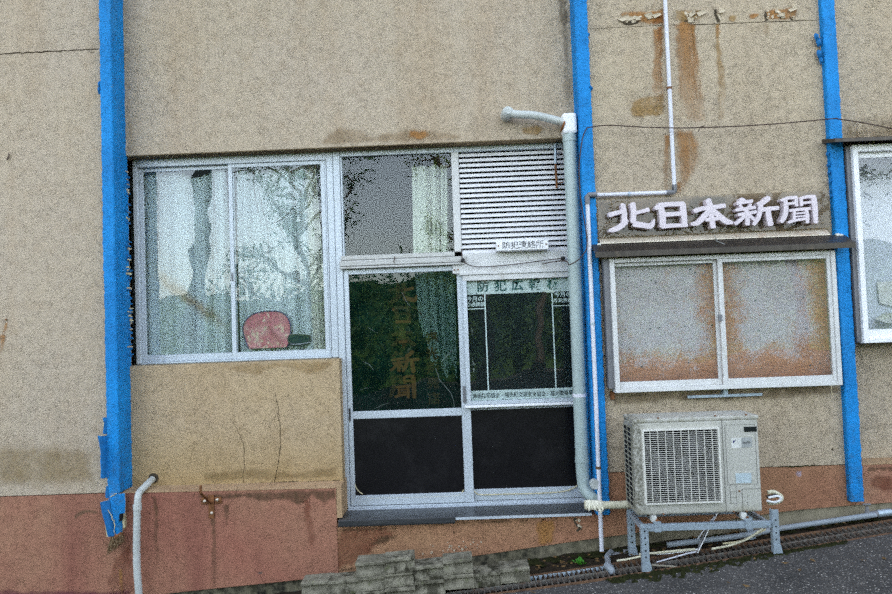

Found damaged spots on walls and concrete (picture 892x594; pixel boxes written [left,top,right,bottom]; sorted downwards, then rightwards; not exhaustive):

crack [0,47,99,55]
flaking render [618,12,662,25]
corrosion [622,10,663,48]
corrosion [677,11,697,76]
flaking render [681,10,708,22]
flaking render [764,4,798,21]
crack [273,394,281,482]
peeling [97,417,127,537]